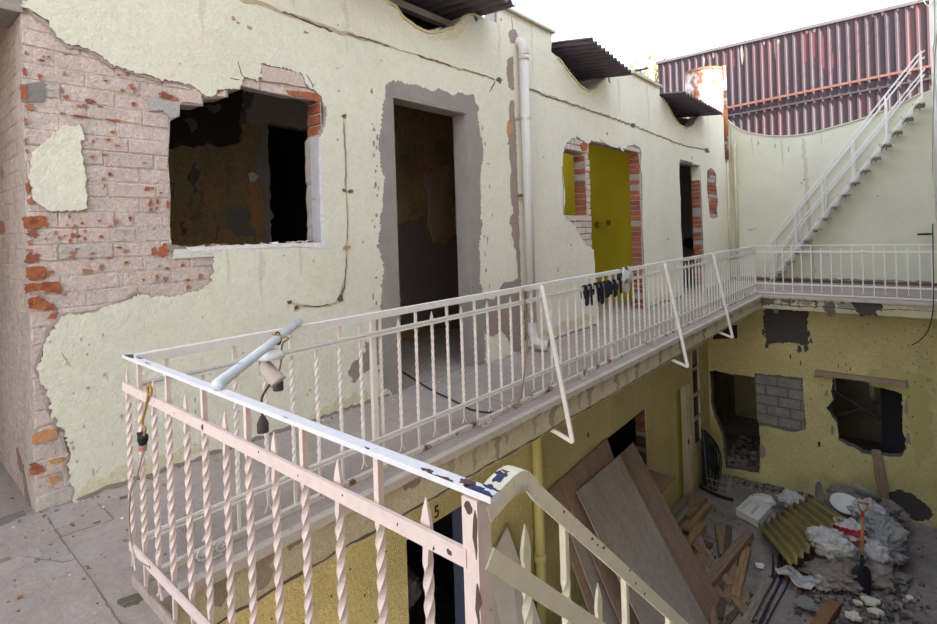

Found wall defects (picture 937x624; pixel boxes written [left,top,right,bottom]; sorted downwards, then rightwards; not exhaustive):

crack [282,11,389,47]
crack [417,54,494,80]
crack [529,89,704,150]
spalling [562,137,642,248]
spalling [707,168,717,219]
spalling [19,8,327,514]